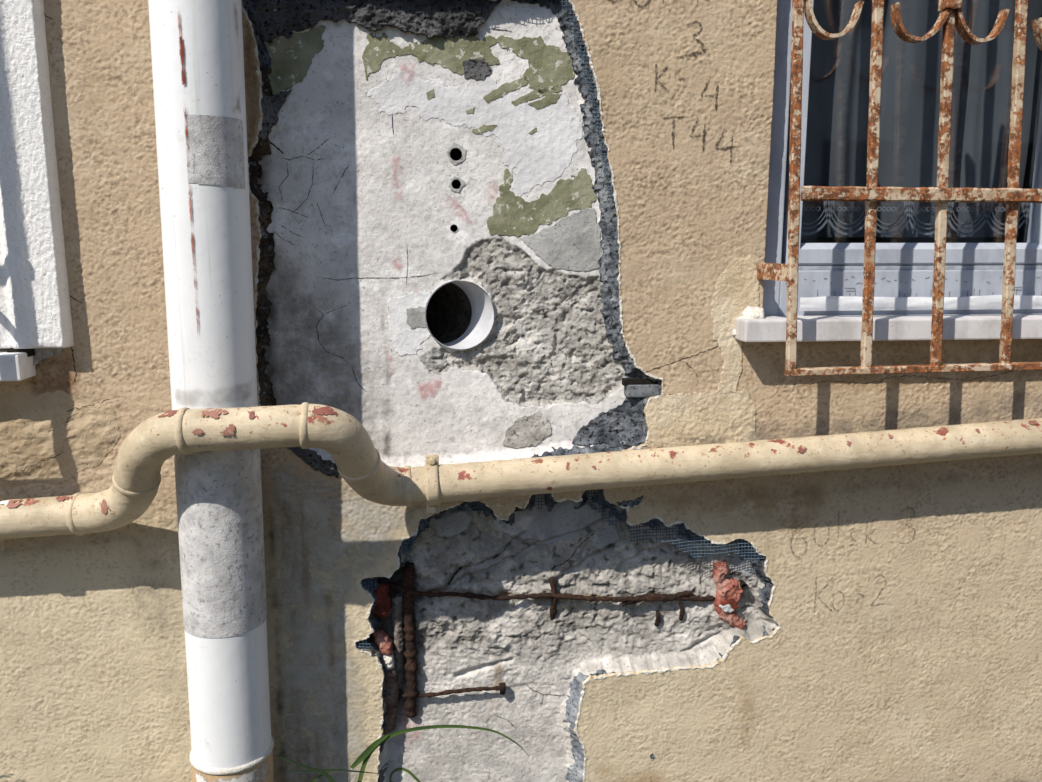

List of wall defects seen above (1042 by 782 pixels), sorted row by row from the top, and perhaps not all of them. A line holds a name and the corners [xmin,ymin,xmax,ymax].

crack [270,137,348,245]
flaking render [242,0,664,469]
peeling [192,409,235,436]
spalling [353,487,781,782]